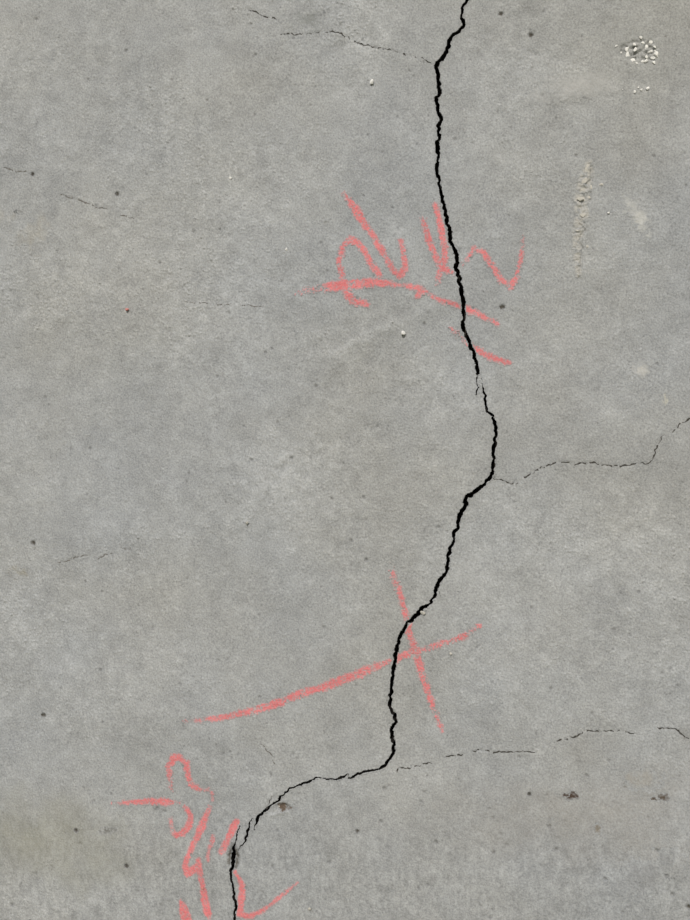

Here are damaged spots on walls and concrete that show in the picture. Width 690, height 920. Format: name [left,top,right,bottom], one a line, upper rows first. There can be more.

crack [227,0,690,920]